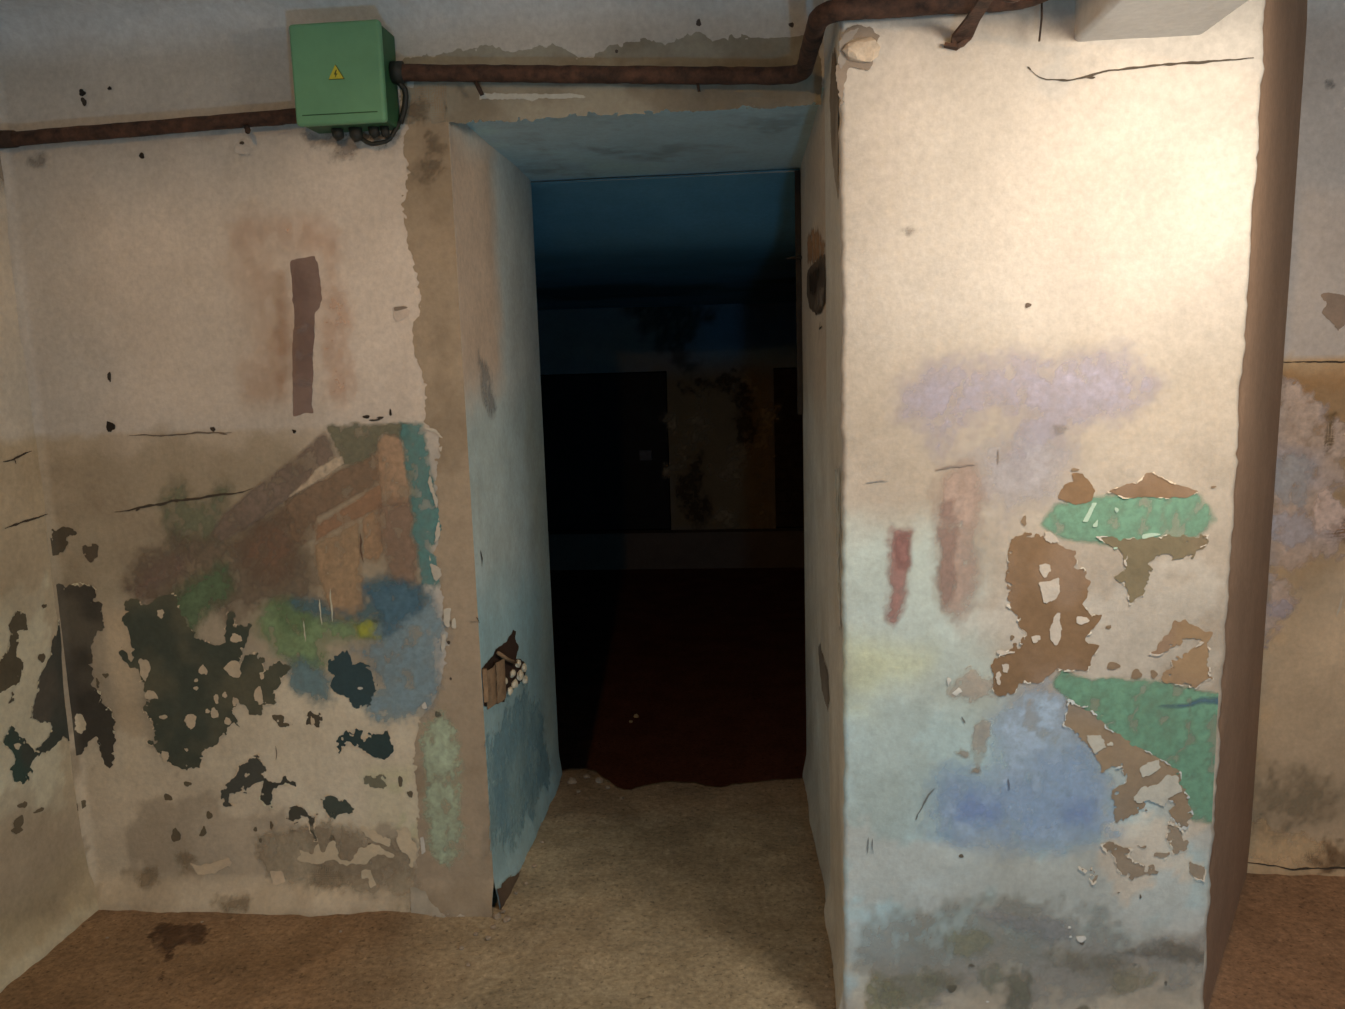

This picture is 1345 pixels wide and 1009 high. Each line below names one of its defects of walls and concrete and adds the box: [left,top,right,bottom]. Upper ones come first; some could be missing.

crack [1028,57,1254,81]
flaking render [1321,292,1345,331]
peeling [50,527,99,563]
crack [119,488,253,512]
peeling [199,19,881,918]
peeling [1058,468,1217,505]
peeling [947,516,1214,702]
peeling [0,582,116,784]
peeling [119,593,291,787]
peeling [1062,699,1206,882]
crack [1248,862,1345,870]
damp [1249,777,1345,873]